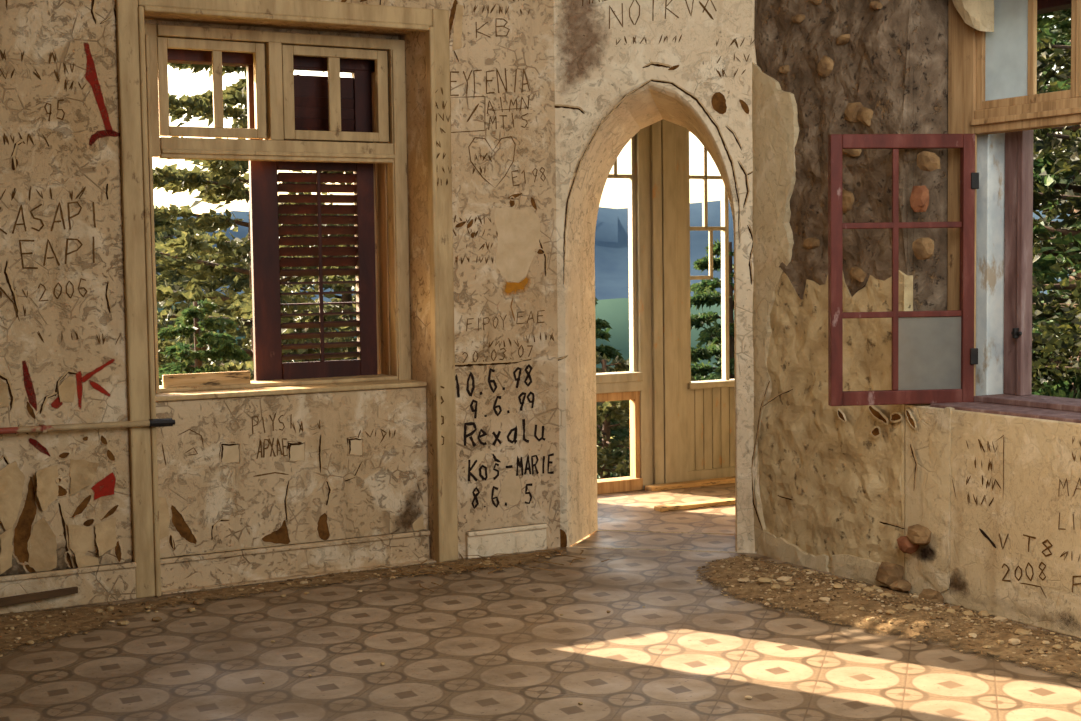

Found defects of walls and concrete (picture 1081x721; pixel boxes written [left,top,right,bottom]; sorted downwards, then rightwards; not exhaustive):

water stain [564,0,597,80]
spalling [755,0,944,604]
flaking render [0,433,123,575]